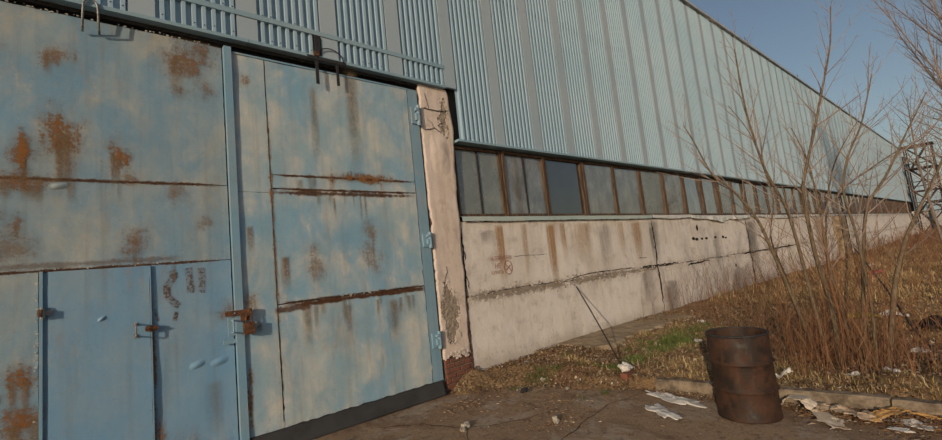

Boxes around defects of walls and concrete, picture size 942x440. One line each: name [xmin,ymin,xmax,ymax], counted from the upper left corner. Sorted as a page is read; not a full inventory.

corrosion [0,111,207,193]
flaking render [438,98,449,139]
corrosion [268,172,423,322]
spalling [470,266,657,302]
flaking render [440,280,594,389]
corrosion [0,363,44,440]